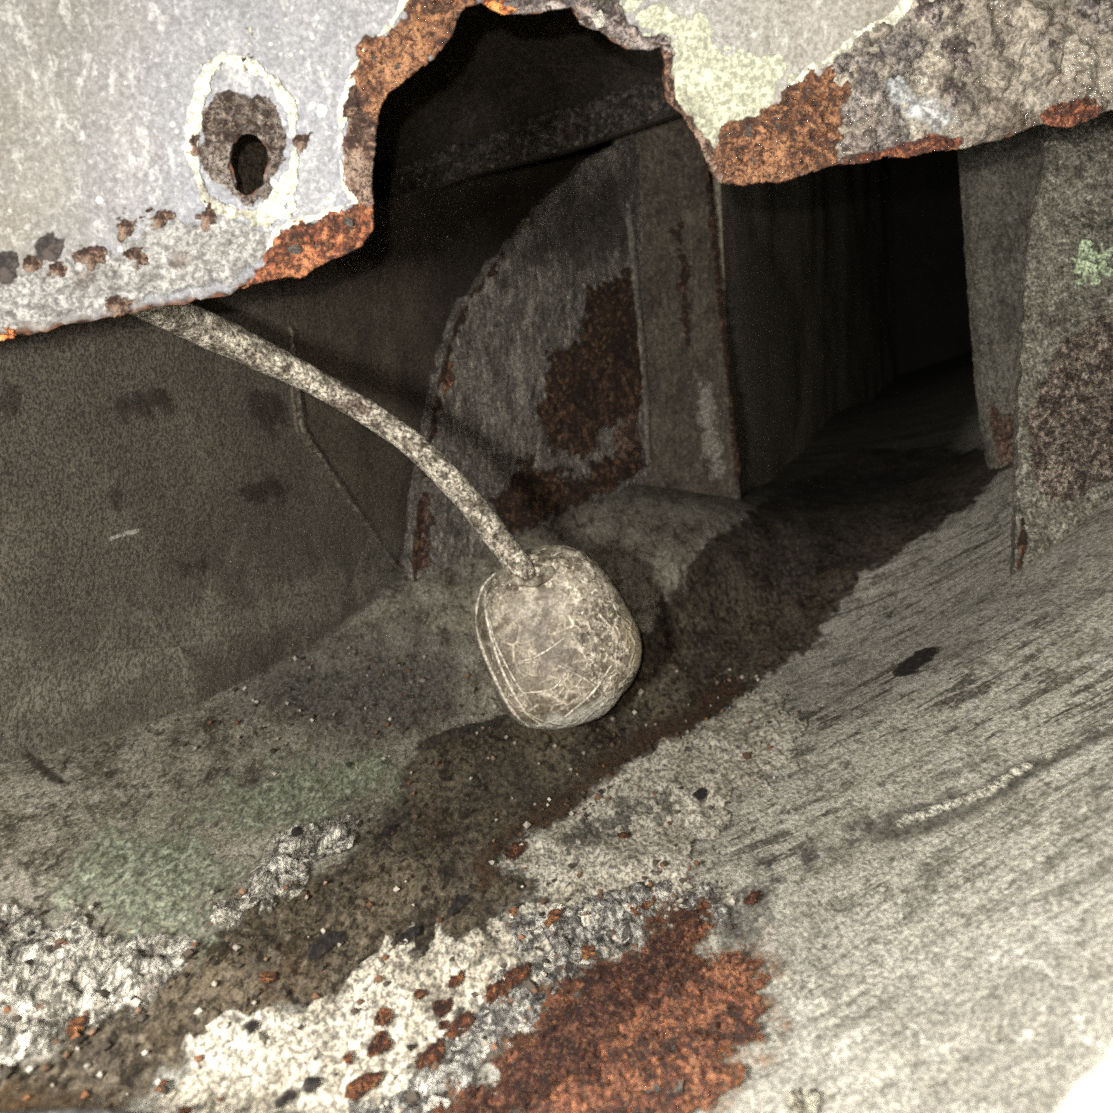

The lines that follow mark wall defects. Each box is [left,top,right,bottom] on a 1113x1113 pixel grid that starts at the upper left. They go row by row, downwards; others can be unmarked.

peeling [181,27,364,253]
peeling [377,0,408,37]
peeling [619,0,914,147]
corrosion [0,0,1113,502]
corrosion [487,267,647,535]
water stain [0,442,1012,1110]
corrosion [397,925,420,945]
corrosion [413,970,474,1071]
corrosion [432,894,786,1113]
corrosion [743,890,759,905]